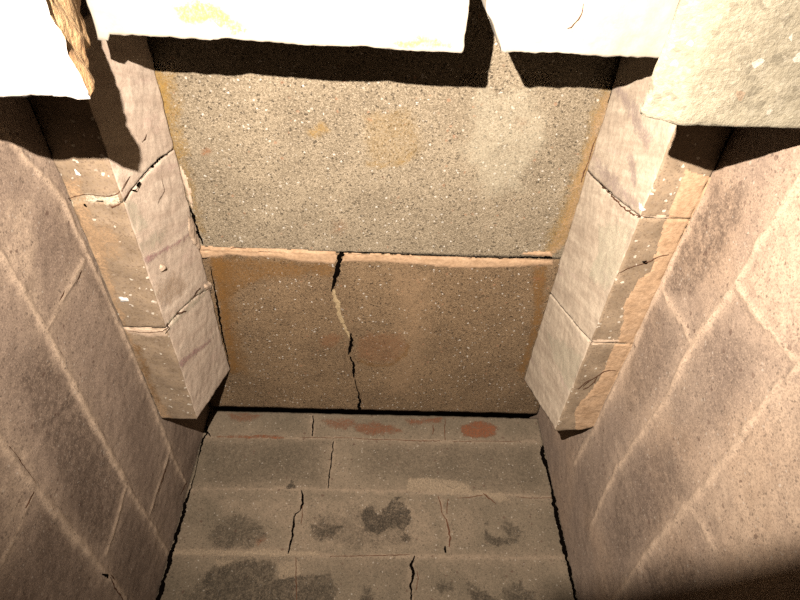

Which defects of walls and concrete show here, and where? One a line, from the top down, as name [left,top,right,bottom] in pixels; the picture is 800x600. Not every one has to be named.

crack [68,154,167,208]
crack [581,139,646,217]
crack [331,251,552,411]
crack [156,426,211,600]
damp [174,548,319,579]
crack [288,490,304,600]
crack [358,554,419,600]
crack [540,445,577,600]